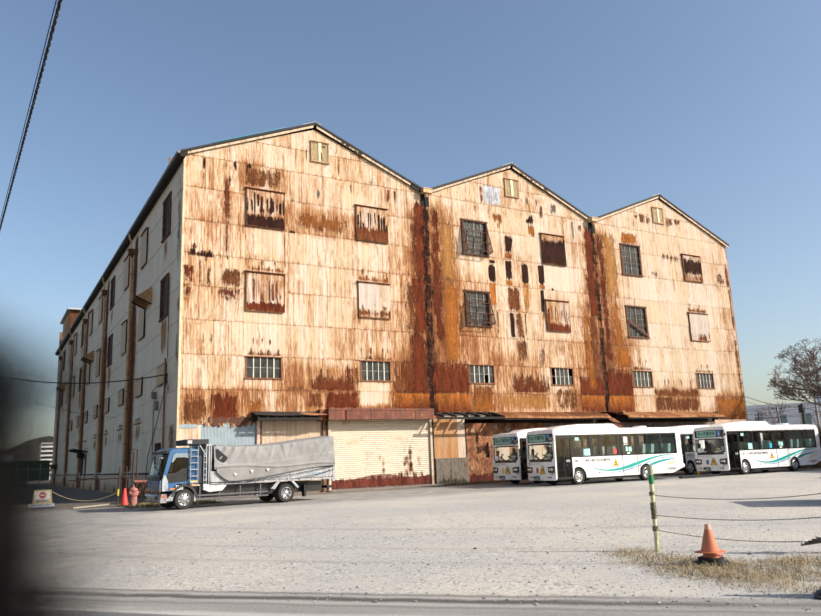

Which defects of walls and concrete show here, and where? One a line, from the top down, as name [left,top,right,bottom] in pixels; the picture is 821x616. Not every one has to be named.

corrosion [177,161,294,312]
corrosion [298,212,346,233]
corrosion [662,253,702,281]
corrosion [357,198,651,419]
corrosion [183,392,237,421]
corrosion [289,365,359,408]
corrosion [655,379,699,411]
corrosion [332,449,431,489]